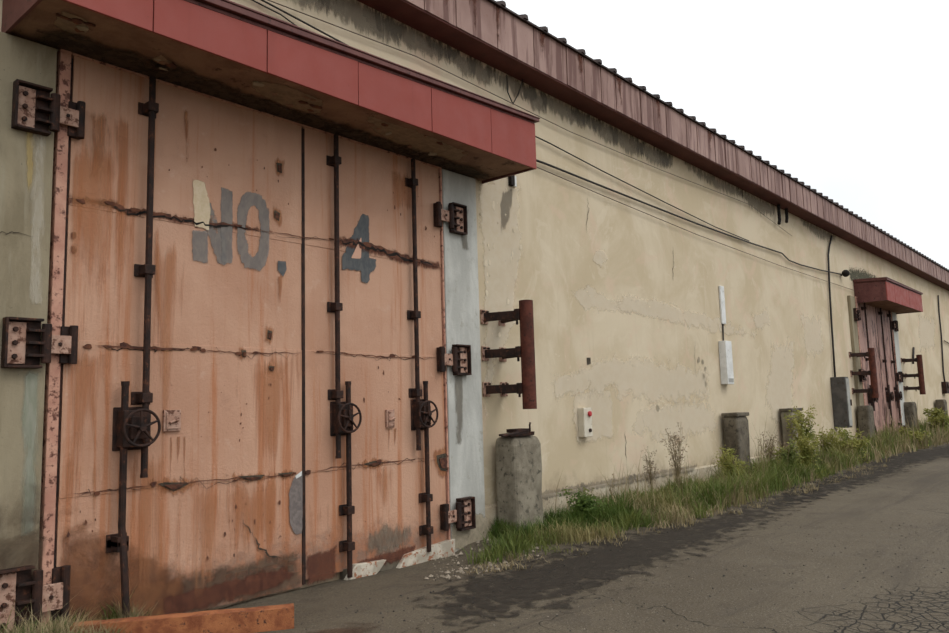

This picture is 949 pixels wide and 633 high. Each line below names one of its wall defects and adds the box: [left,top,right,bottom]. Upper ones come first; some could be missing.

crack [68,198,440,269]
crack [83,342,434,361]
crack [73,457,424,496]
rust [224,472,293,541]
rust [358,524,415,565]